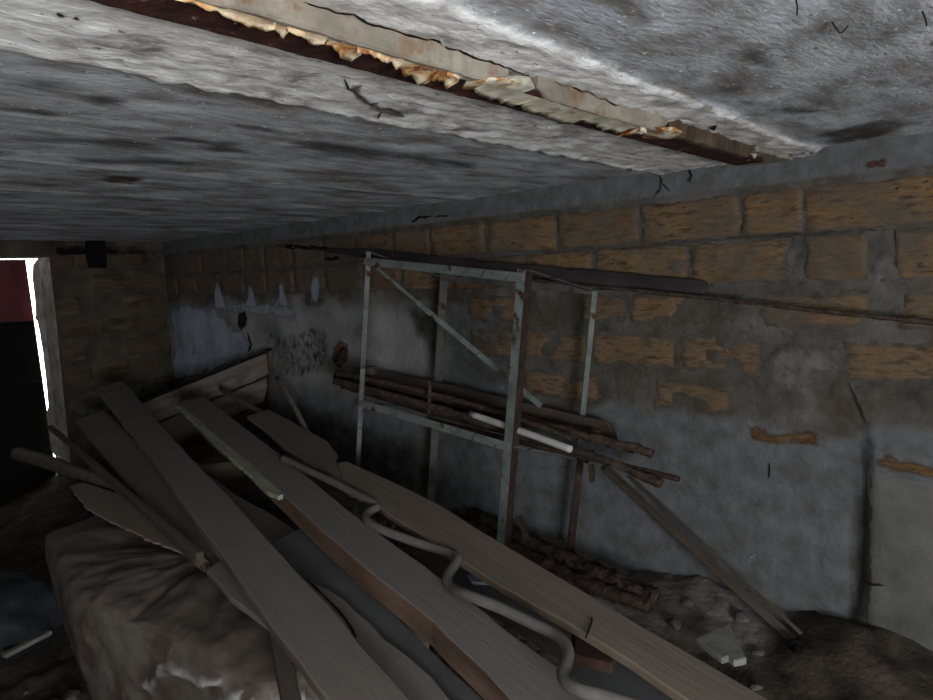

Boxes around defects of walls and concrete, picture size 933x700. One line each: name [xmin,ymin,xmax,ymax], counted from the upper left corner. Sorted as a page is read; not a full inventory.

peeling [176,0,463,89]
crack [344,79,404,119]
peeling [473,84,647,138]
crack [603,169,926,250]
crack [848,382,884,621]